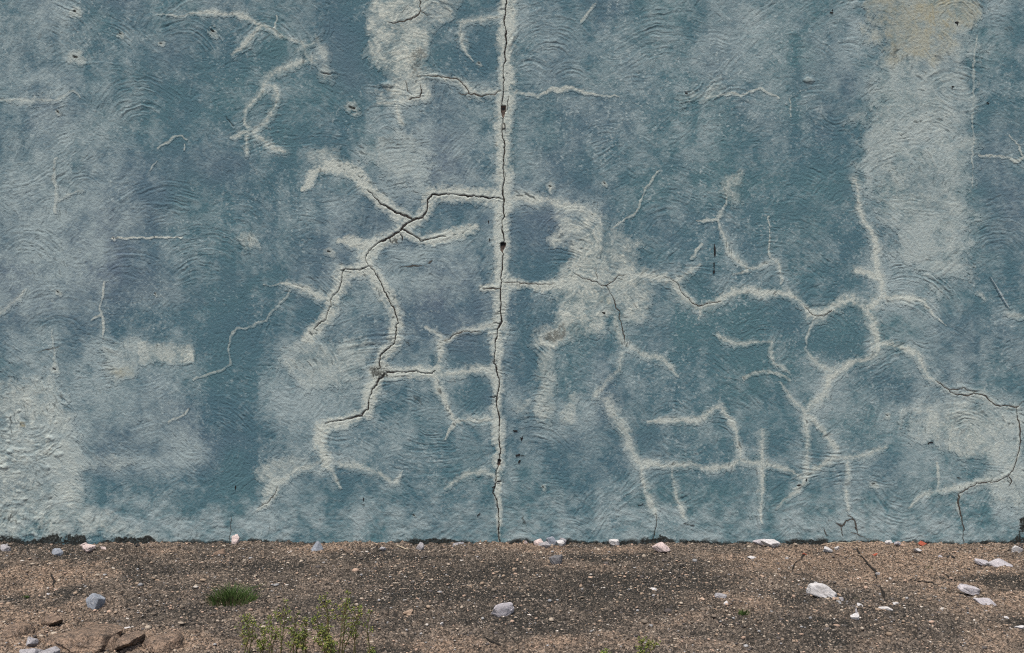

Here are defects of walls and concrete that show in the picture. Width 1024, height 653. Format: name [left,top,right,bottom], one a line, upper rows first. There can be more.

damp [149,135,188,171]
damp [157,7,340,159]
crack [315,0,626,542]
damp [192,0,1024,546]
damp [0,328,378,546]
crack [935,380,1024,541]